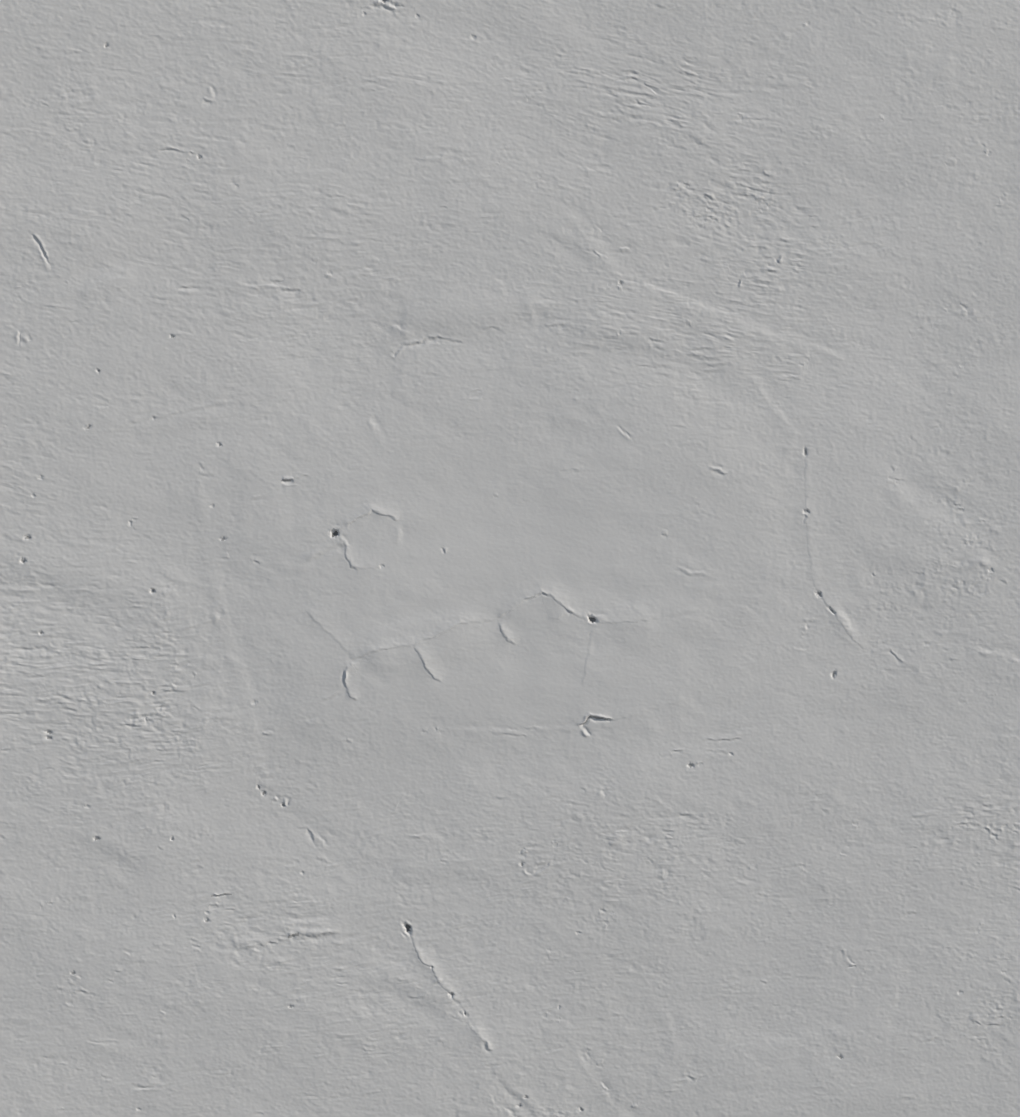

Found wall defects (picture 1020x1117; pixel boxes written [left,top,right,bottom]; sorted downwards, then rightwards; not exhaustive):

crack [300,590,704,741]
crack [402,921,530,1117]